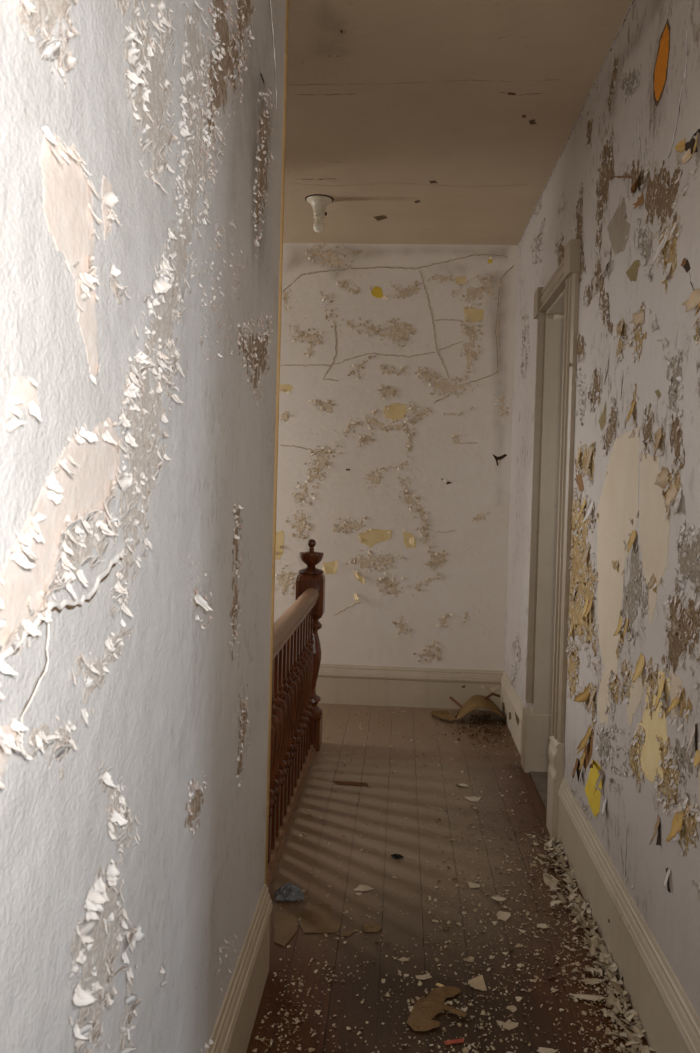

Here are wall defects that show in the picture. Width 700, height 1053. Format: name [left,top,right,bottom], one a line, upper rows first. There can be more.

crack [270,0,634,404]
peeling [606,55,641,114]
spalling [653,19,671,107]
crack [667,33,700,159]
peeling [0,0,274,789]
peeling [280,256,500,597]
peeling [530,119,700,857]
peeling [69,759,146,1053]
peeling [185,775,207,838]